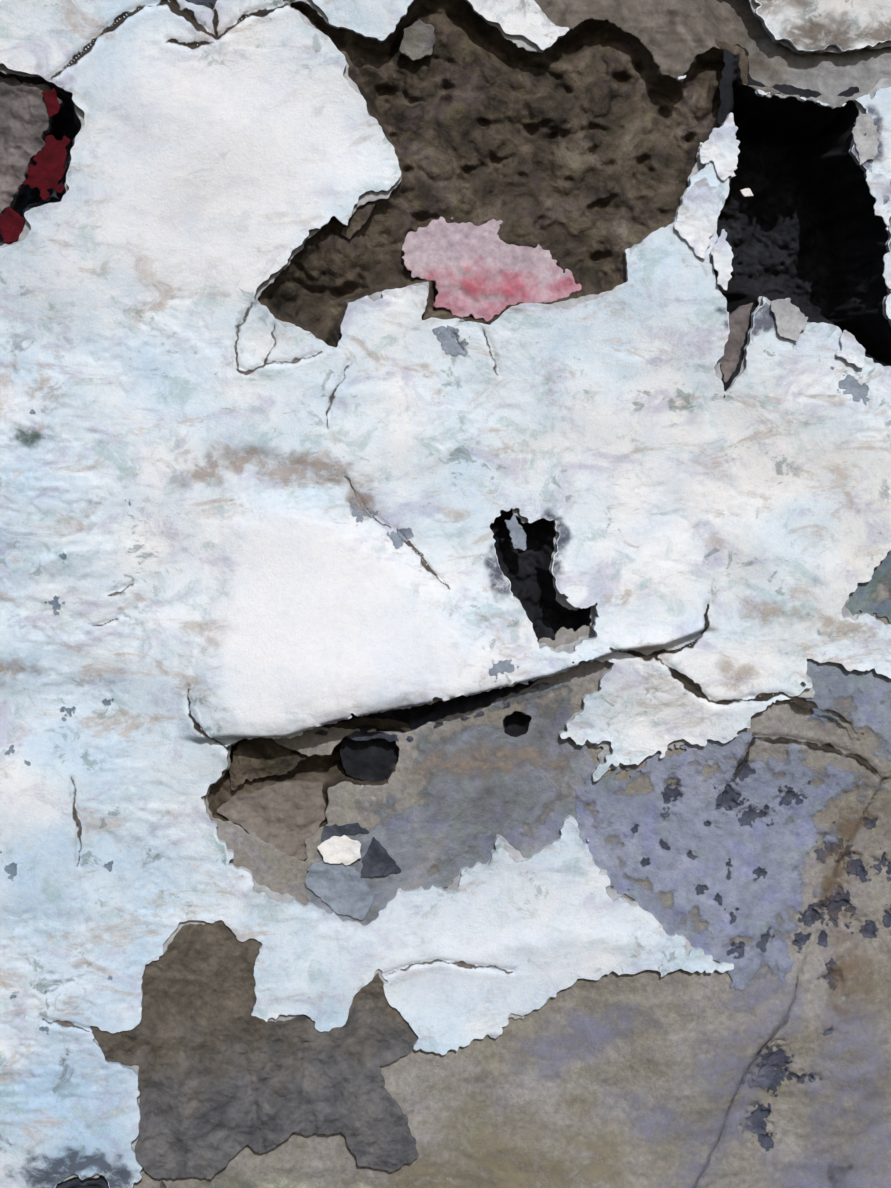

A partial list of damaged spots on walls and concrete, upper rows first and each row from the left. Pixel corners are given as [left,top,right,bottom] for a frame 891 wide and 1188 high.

crack [51,0,296,78]
spalling [185,0,217,9]
spalling [258,0,749,347]
peeling [851,113,891,231]
peeling [882,252,891,289]
peeling [770,298,808,342]
peeling [831,330,870,405]
spalling [490,509,593,649]
peeling [846,550,891,625]
peeling [91,659,891,1188]
crack [390,959,513,974]
crack [694,979,799,1188]